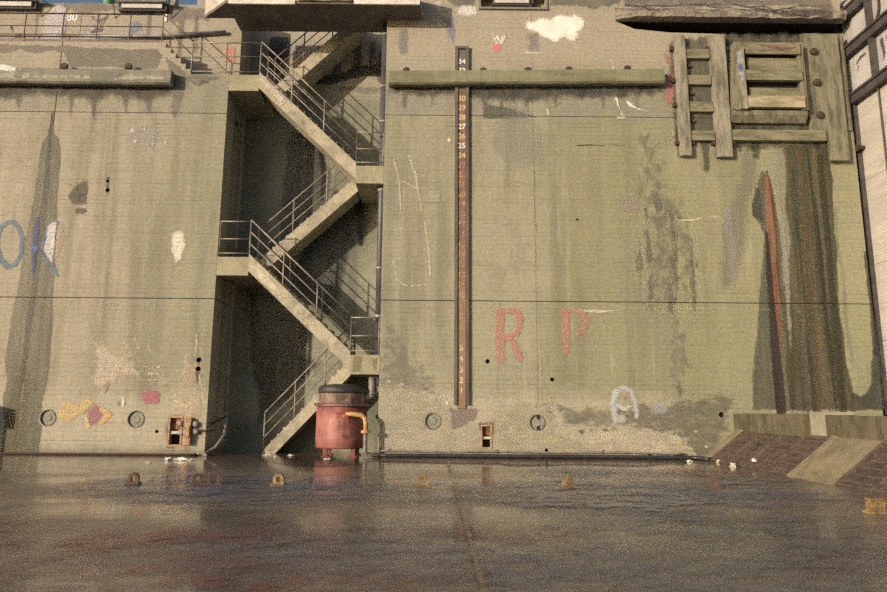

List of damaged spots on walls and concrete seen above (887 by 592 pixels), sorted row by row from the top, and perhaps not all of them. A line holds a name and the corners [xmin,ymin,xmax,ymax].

damp [0,3,219,118]
damp [393,87,455,102]
damp [469,86,662,119]
damp [685,38,708,49]
damp [686,60,712,101]
damp [690,113,714,131]
damp [725,34,801,90]
damp [731,119,809,130]
damp [0,113,61,452]
corrosion [764,174,786,414]
damp [733,135,884,413]
damp [250,293,315,416]